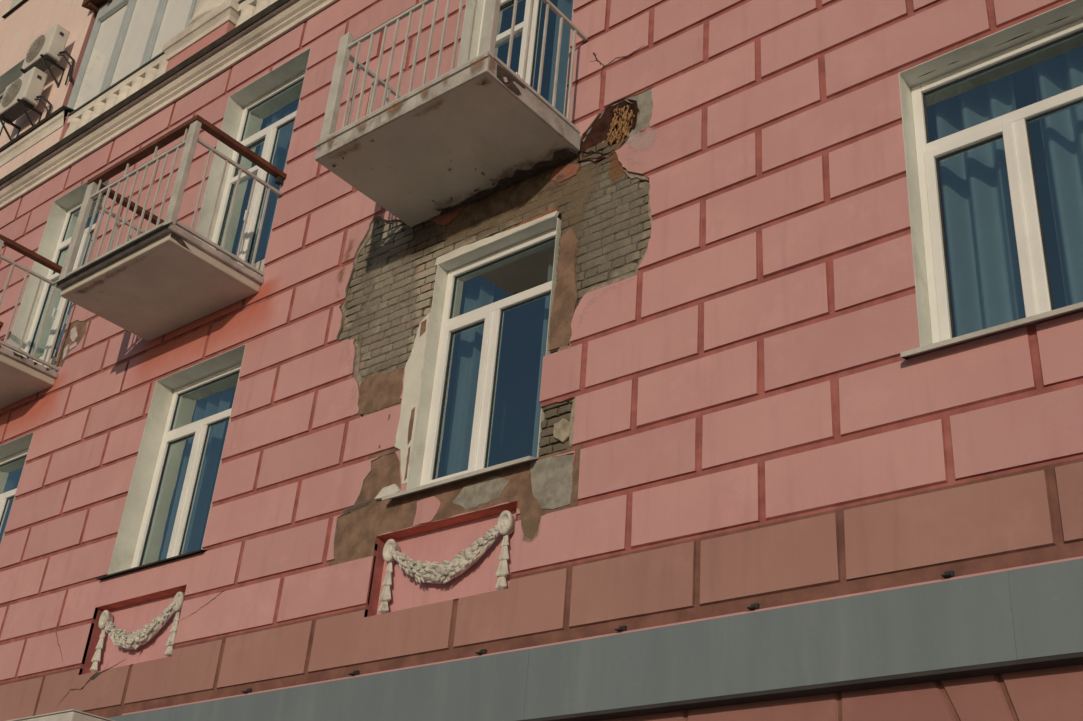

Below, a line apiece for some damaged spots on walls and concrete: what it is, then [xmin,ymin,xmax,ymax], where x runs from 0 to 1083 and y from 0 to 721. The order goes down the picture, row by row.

spalling [329,140,652,566]
crack [57,660,124,706]